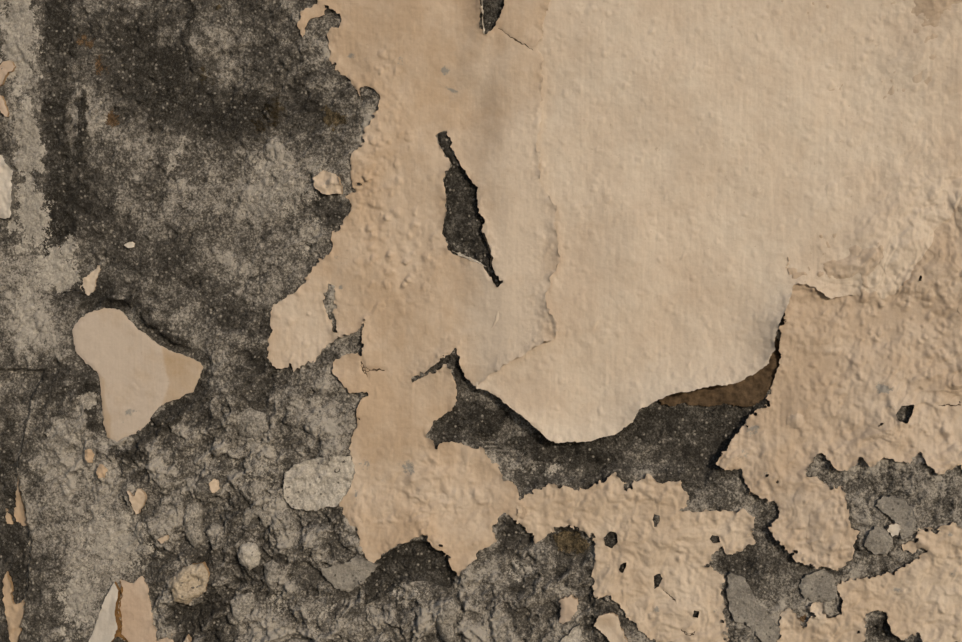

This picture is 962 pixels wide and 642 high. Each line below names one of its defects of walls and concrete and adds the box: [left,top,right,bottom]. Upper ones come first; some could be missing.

peeling [0,60,16,117]
peeling [0,155,16,219]
peeling [80,265,101,296]
peeling [267,0,962,642]
flaking render [72,308,204,442]
peeling [5,476,28,526]
peeling [85,449,108,478]
peeling [127,488,147,515]
peeling [209,479,220,493]
peeling [2,571,25,642]
peeling [89,576,192,642]